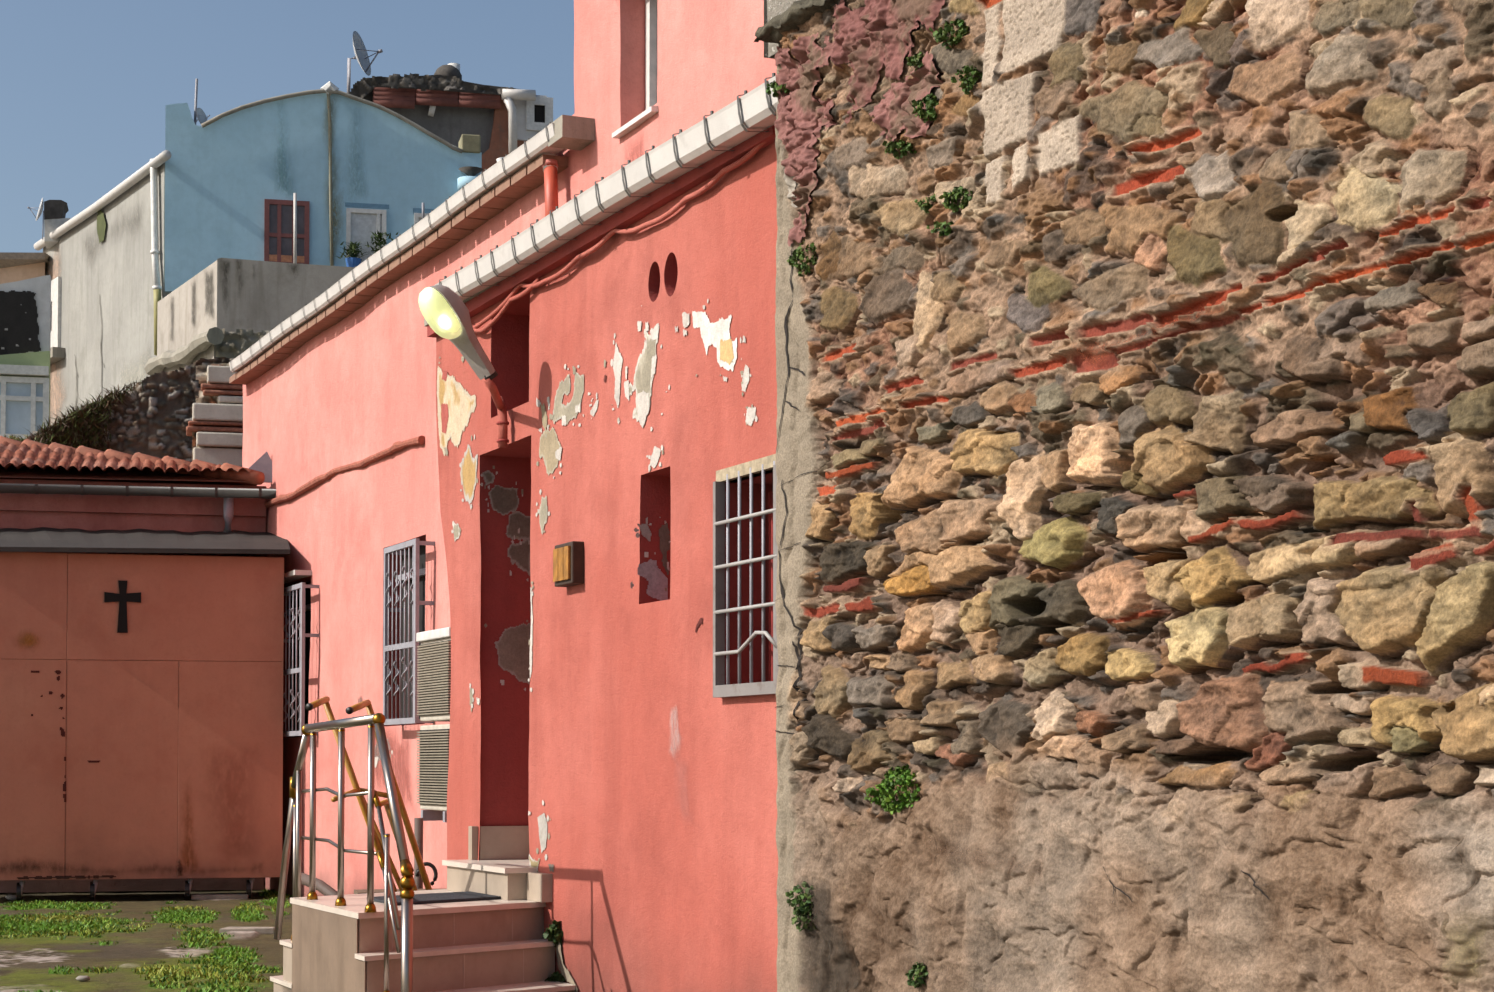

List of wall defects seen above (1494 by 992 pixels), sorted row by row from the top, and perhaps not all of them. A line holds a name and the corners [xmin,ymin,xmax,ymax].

damp [192,263,241,323]
peeling [437,300,757,692]
crack [1103,867,1132,903]
crack [1241,870,1269,899]